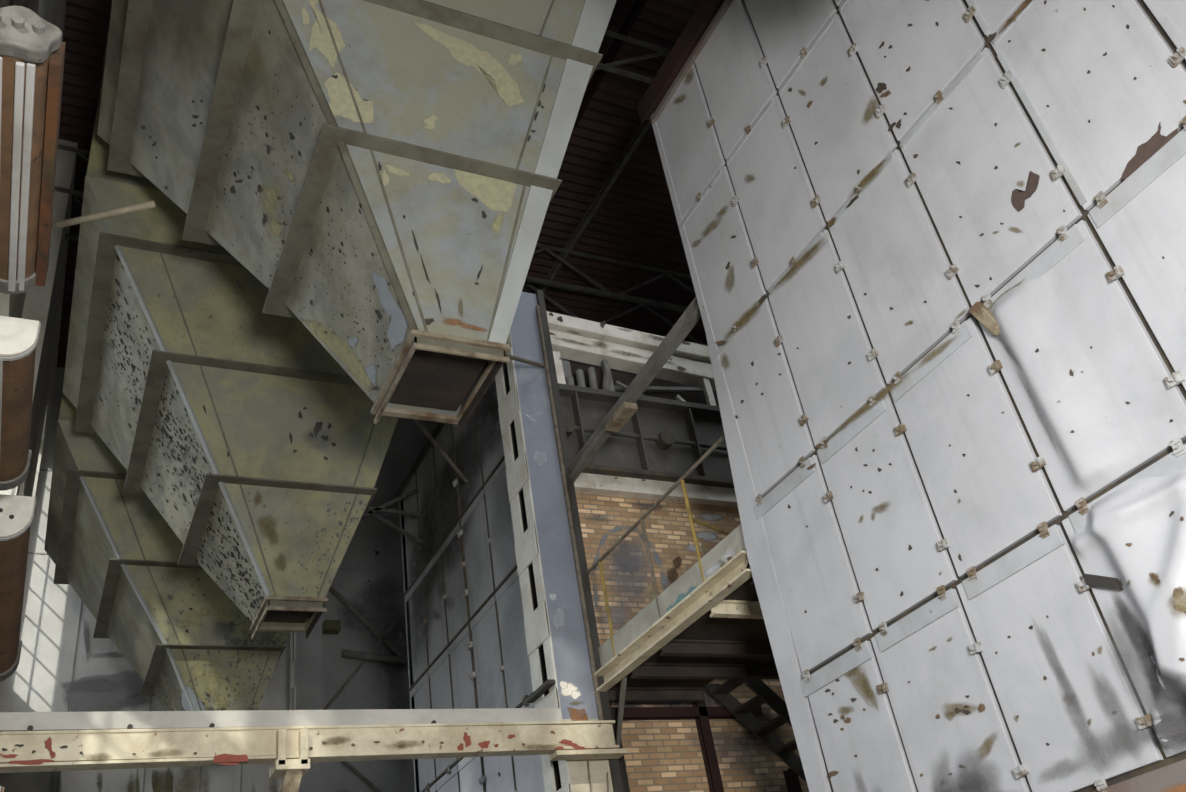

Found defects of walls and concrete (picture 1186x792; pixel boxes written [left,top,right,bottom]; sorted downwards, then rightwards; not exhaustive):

peeling [1121,122,1178,180]
peeling [216,65,411,391]
peeling [427,169,517,231]
peeling [1011,171,1040,212]
peeling [412,231,441,312]
water stain [127,768,207,792]